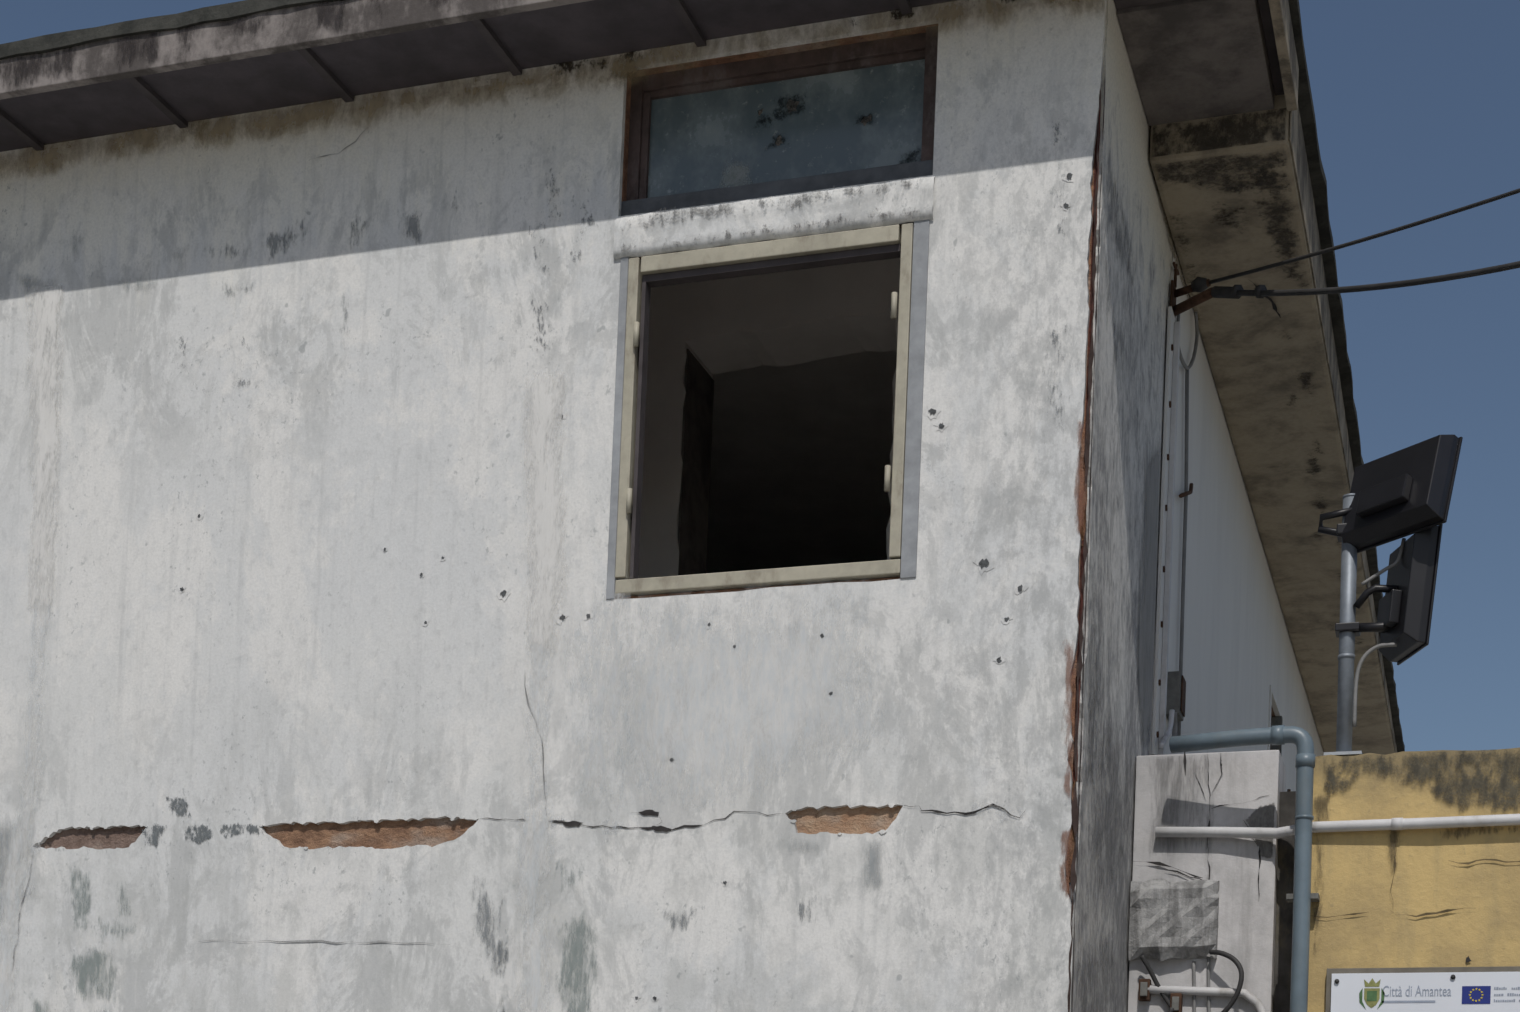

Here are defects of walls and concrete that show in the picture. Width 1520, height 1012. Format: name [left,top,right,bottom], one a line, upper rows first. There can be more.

leakage [1152,108,1304,287]
crack [479,684,774,832]
spalling [36,797,477,850]
spalling [787,804,903,835]
leakage [1390,830,1398,867]
leakage [1315,749,1520,837]
leakage [72,875,90,918]
leakage [72,950,111,994]